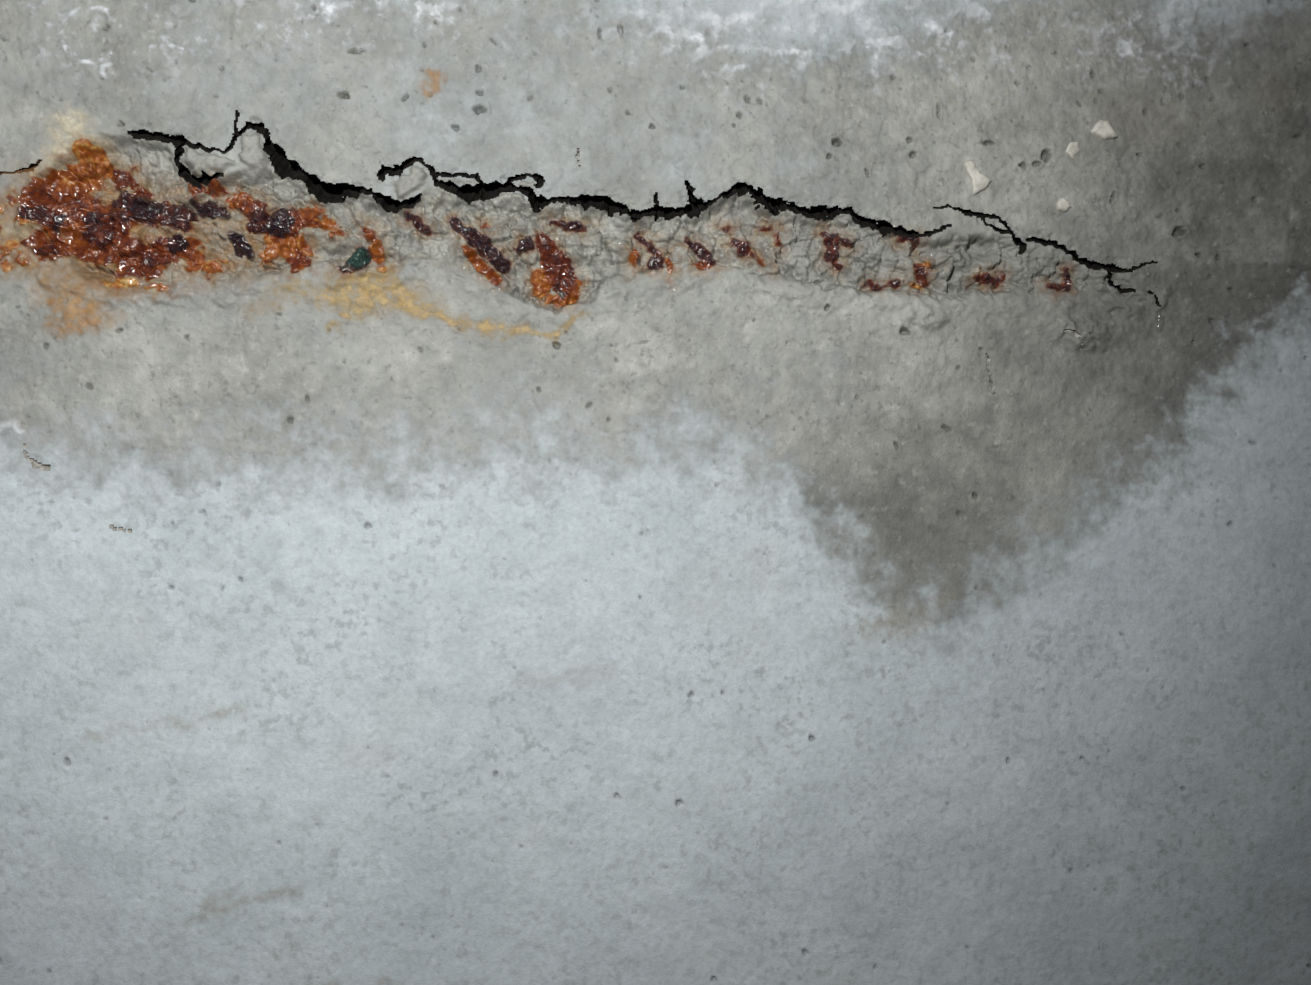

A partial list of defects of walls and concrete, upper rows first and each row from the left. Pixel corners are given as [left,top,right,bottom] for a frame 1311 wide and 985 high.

rust [0,112,587,338]
crack [127,110,1162,307]
rust [628,232,673,274]
rust [684,236,716,270]
rust [721,225,782,267]
rust [819,231,854,271]
rust [864,235,931,291]
rust [972,272,1005,289]
rust [1046,267,1072,291]
water stain [0,0,1311,617]